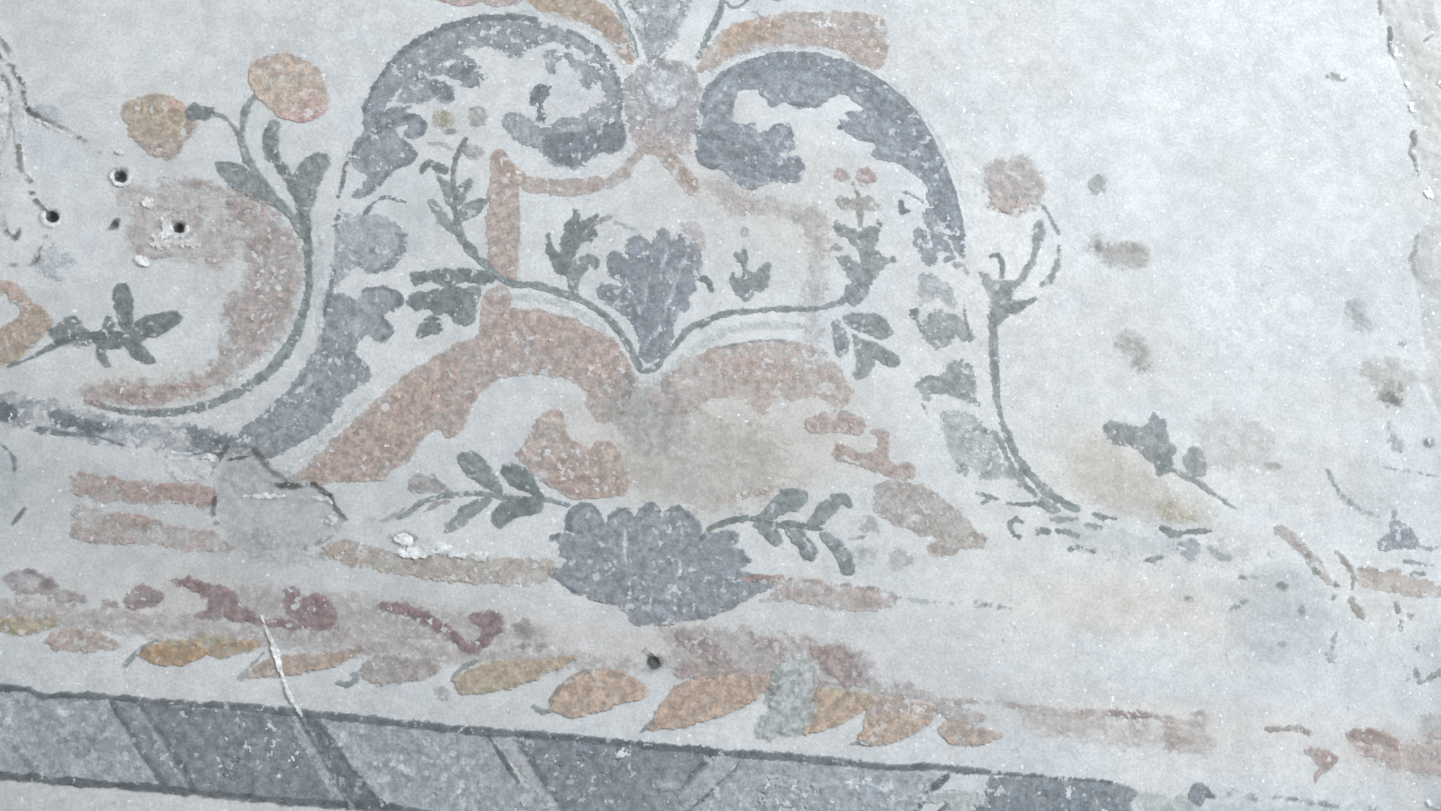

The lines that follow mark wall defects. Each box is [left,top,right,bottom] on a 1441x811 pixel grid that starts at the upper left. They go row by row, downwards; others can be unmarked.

crack [1379,0,1441,199]
crack [170,444,348,525]